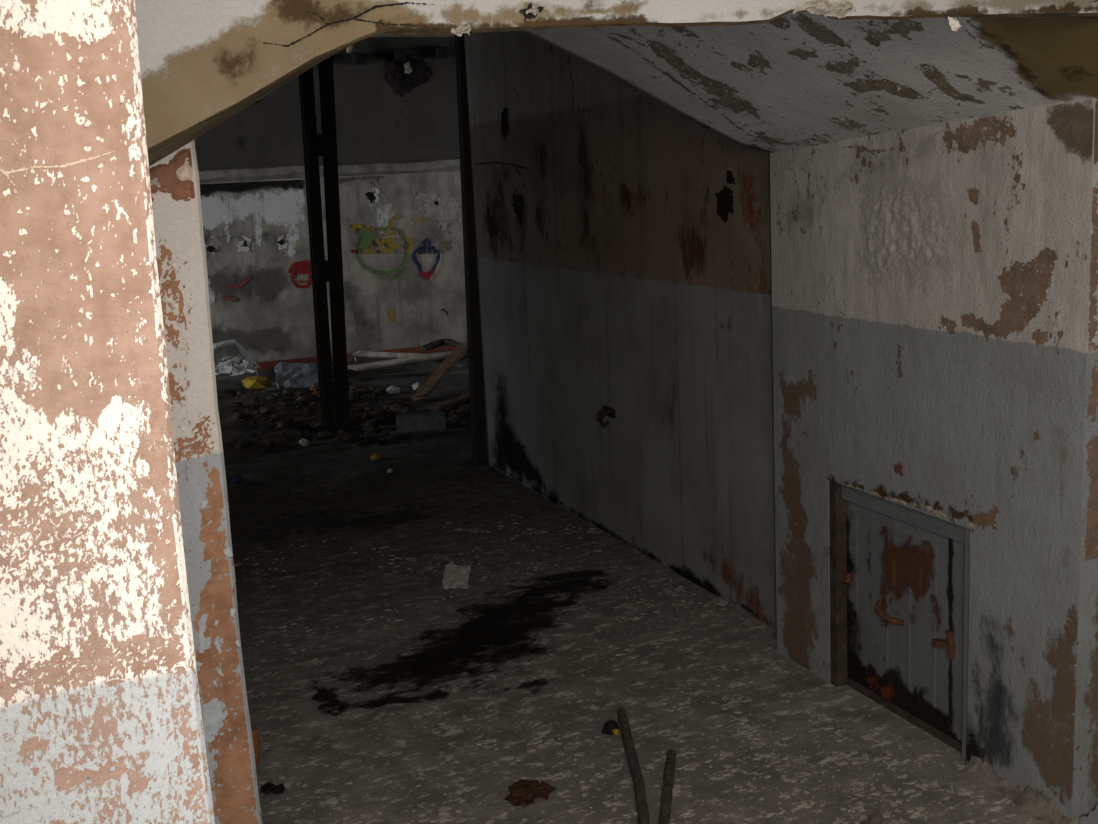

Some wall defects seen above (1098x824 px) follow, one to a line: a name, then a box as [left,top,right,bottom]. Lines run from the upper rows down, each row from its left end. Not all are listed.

crack [260,2,434,47]
water stain [141,0,657,149]
peeling [626,26,777,124]
peeling [749,12,985,105]
peeling [937,116,1020,158]
water stain [893,0,1098,163]
peeling [931,234,1058,353]
peeling [0,16,258,824]
peeling [1082,183,1098,570]
peeling [778,370,819,670]
corrosion [867,526,941,627]
peeling [1021,607,1098,805]